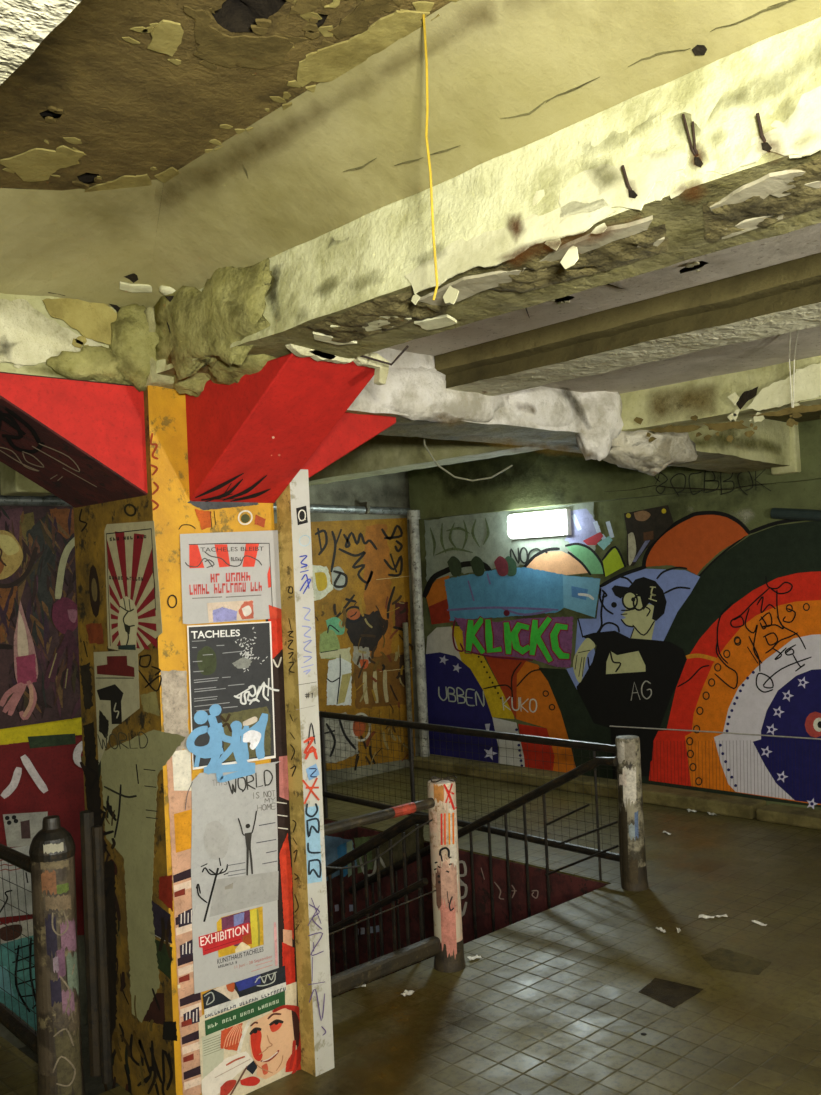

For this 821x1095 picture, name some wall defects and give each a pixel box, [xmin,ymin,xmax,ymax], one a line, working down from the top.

peeling [122,20,184,65]
peeling [212,0,440,112]
crack [628,0,795,67]
spalling [39,106,64,123]
peeling [0,137,180,192]
peeling [205,124,253,153]
crack [500,77,599,119]
peeling [285,86,821,385]
spalling [119,273,152,292]
peeling [0,298,117,369]